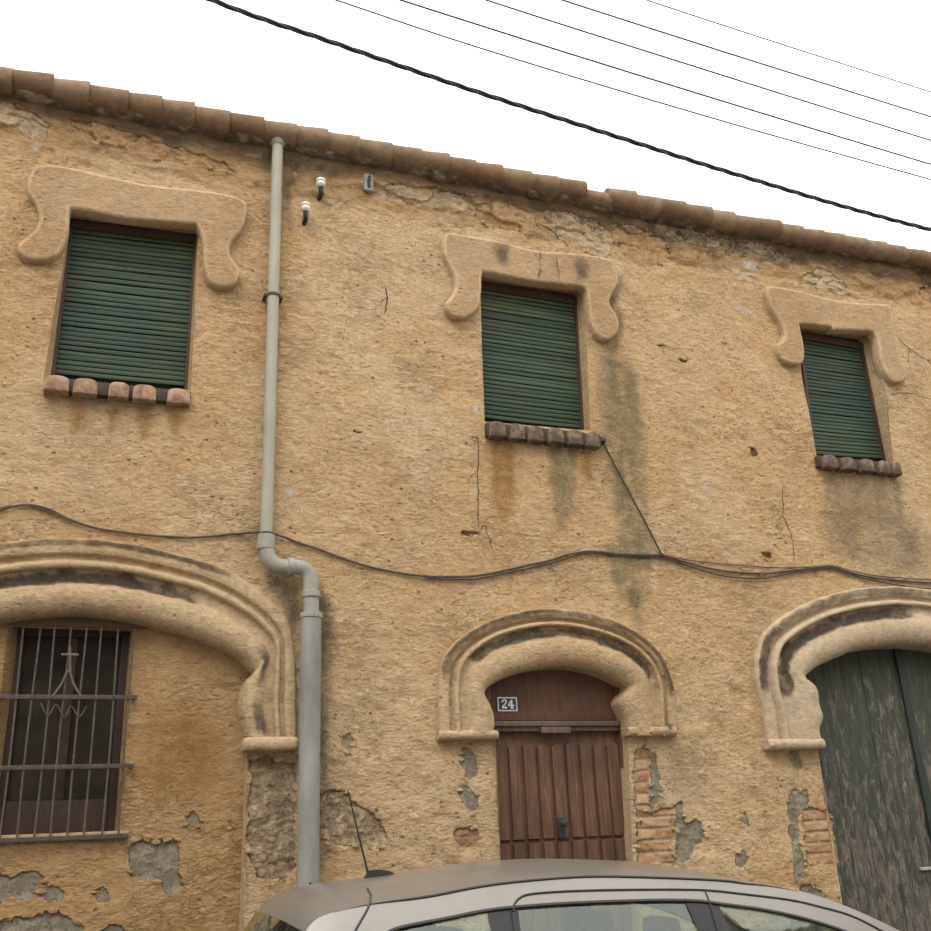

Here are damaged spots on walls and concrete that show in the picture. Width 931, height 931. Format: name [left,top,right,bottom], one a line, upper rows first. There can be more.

spalling [385,184,793,270]
crack [468,436,493,550]
leakage [604,345,647,604]
crack [776,487,794,567]
spalling [0,864,83,931]
spalling [129,834,187,895]
spalling [244,754,297,882]
spalling [320,791,387,850]
spalling [454,748,479,847]
flaking render [786,788,840,897]